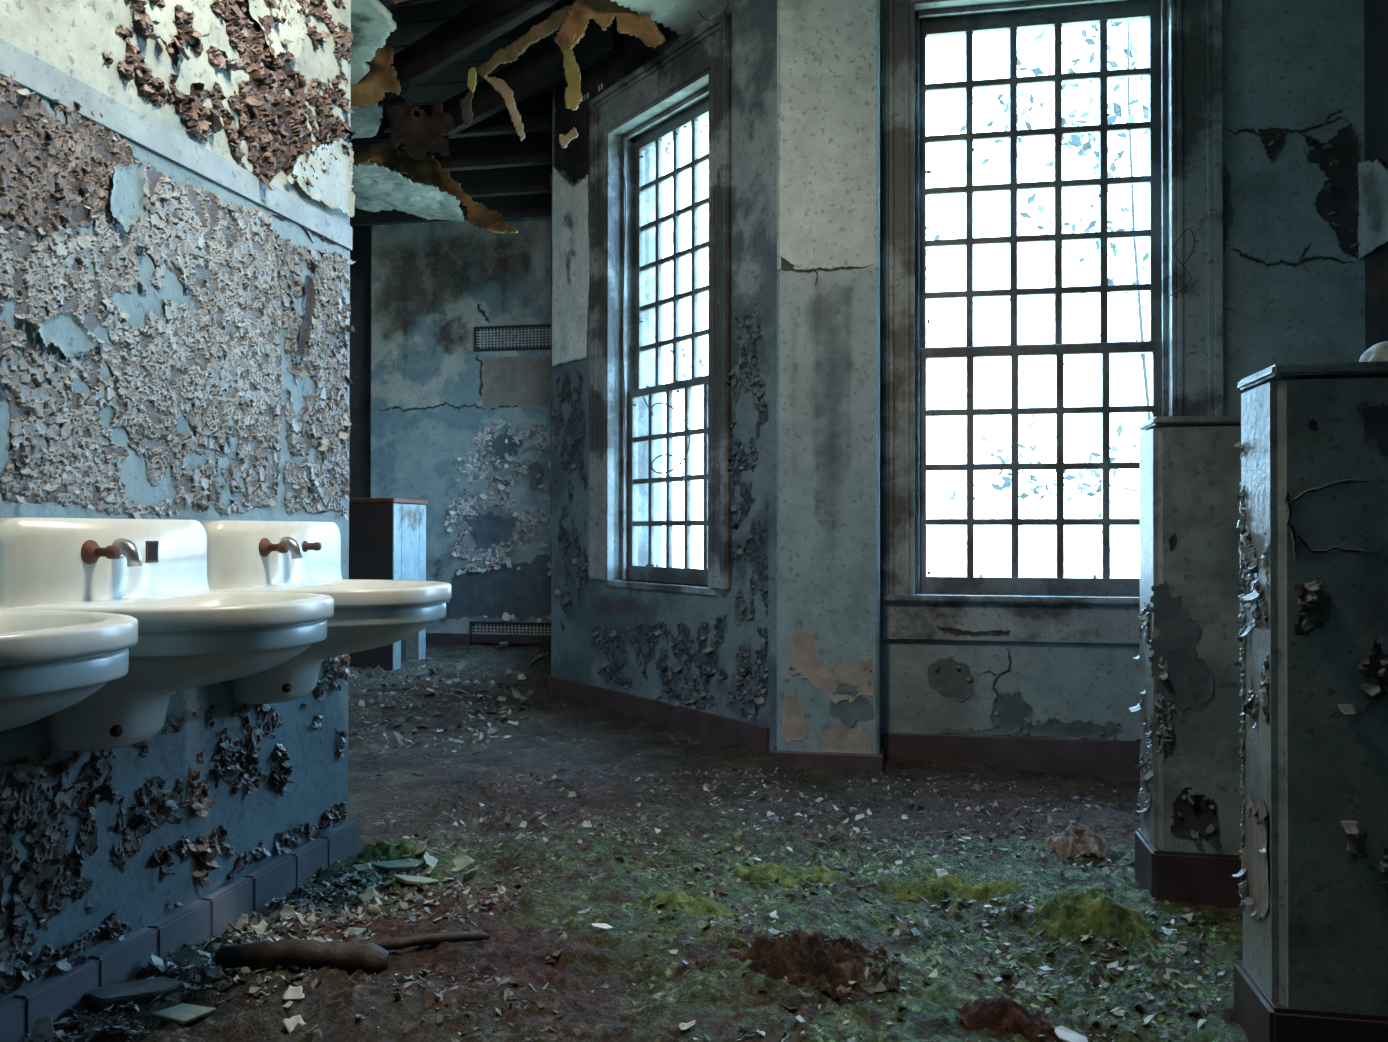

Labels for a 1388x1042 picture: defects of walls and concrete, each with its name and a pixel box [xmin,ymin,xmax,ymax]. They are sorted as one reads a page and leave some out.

peeling [103,0,358,217]
peeling [553,21,679,186]
crack [1224,108,1357,137]
peeling [0,69,357,521]
water stain [380,235,530,351]
crack [777,264,873,285]
crack [1228,242,1358,269]
crack [374,355,542,412]
peeling [438,355,589,631]
crack [980,648,1012,726]
peeling [936,582,1213,813]
peeling [0,704,347,996]